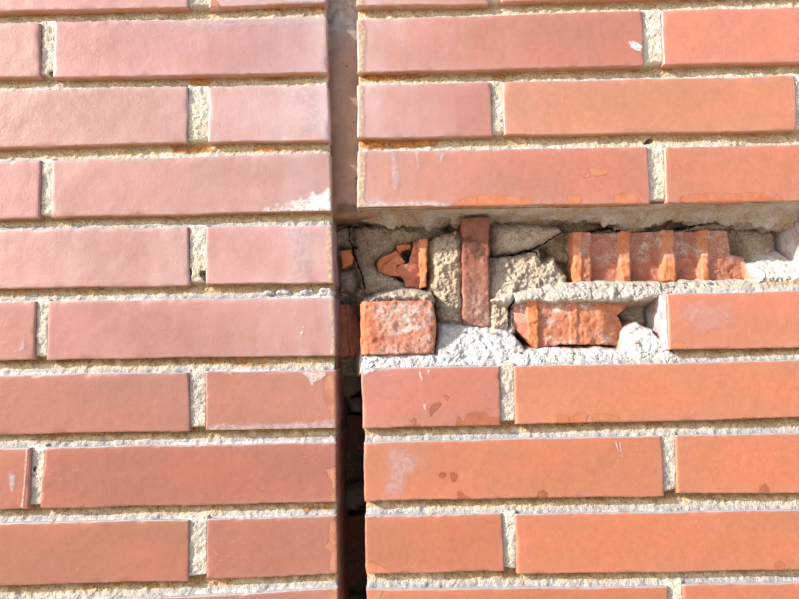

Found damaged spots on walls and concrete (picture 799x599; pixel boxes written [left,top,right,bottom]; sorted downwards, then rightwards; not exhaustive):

water stain [266,183,331,212]
spalling [263,192,799,426]